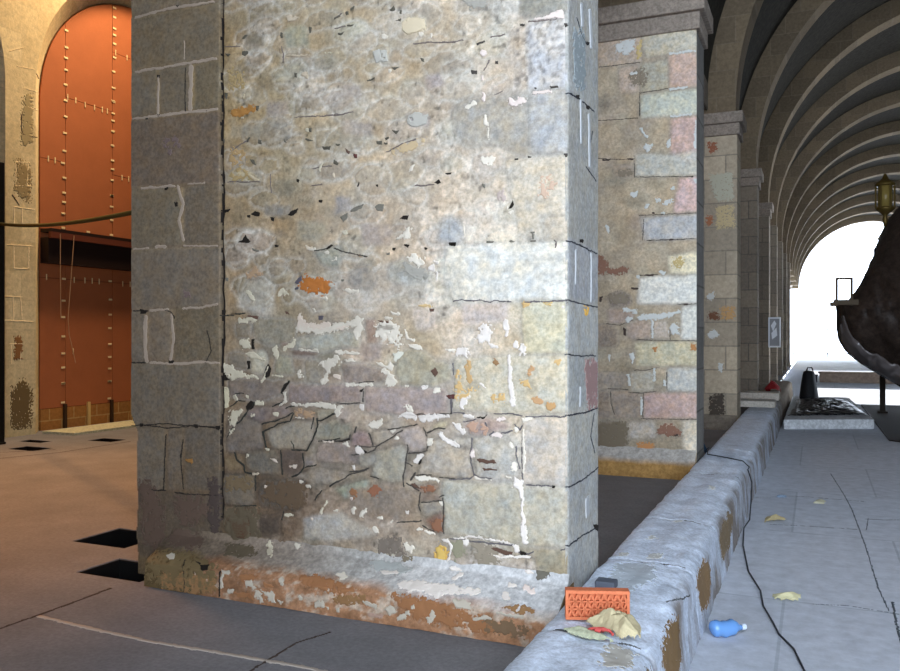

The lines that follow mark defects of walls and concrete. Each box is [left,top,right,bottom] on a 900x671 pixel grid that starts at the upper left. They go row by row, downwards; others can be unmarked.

leakage [20,93,34,147]
crack [565,88,692,181]
leakage [13,158,33,203]
leakage [10,377,34,430]
crack [131,368,697,555]